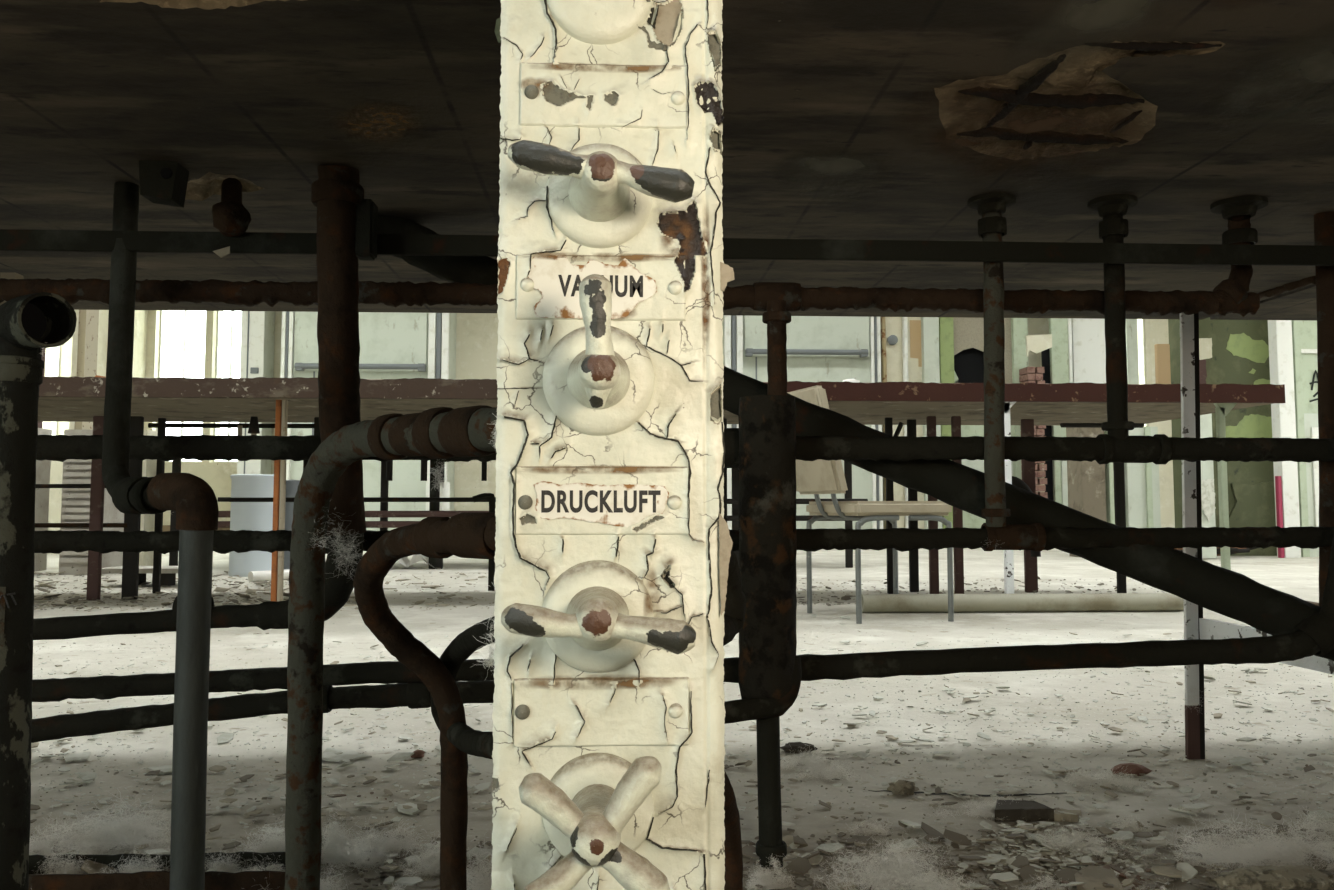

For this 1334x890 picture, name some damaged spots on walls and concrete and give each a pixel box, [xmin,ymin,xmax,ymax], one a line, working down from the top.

spalling [100,0,305,10]
peeling [637,0,683,51]
peeling [708,30,721,71]
peeling [543,81,619,110]
peeling [720,262,735,291]
crack [646,324,700,382]
crack [498,325,566,589]
peeling [519,514,537,525]
peeling [662,566,675,588]
crack [616,414,725,668]
peeling [719,513,733,616]
crack [506,645,710,890]